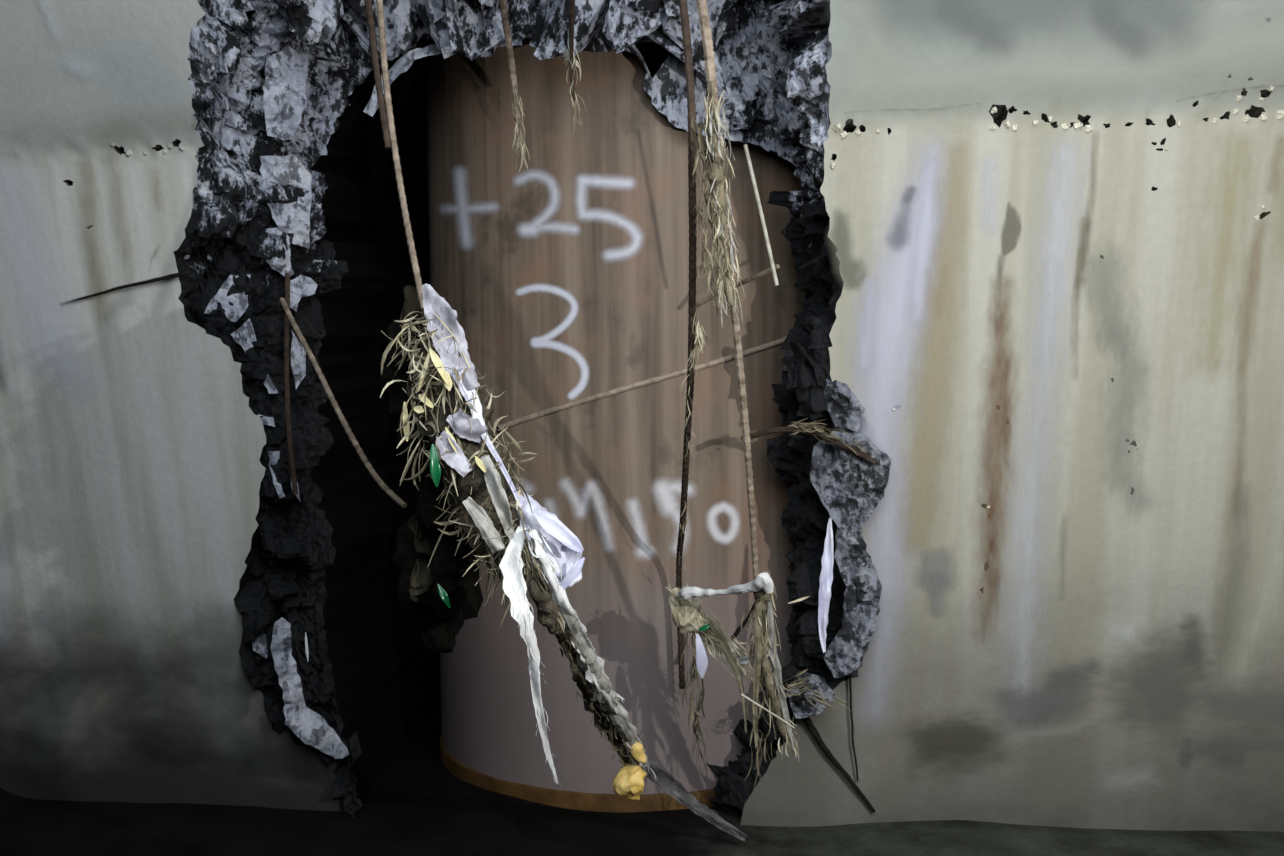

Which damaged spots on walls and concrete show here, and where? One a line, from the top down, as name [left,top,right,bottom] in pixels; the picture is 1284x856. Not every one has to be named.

damp [835,216,858,283]
damp [991,206,1020,274]
spalling [989,104,1181,134]
spalling [1192,77,1284,125]
spalling [174,0,892,817]
damp [861,153,936,682]
corrosion [986,352,1006,600]
damp [1019,149,1071,659]